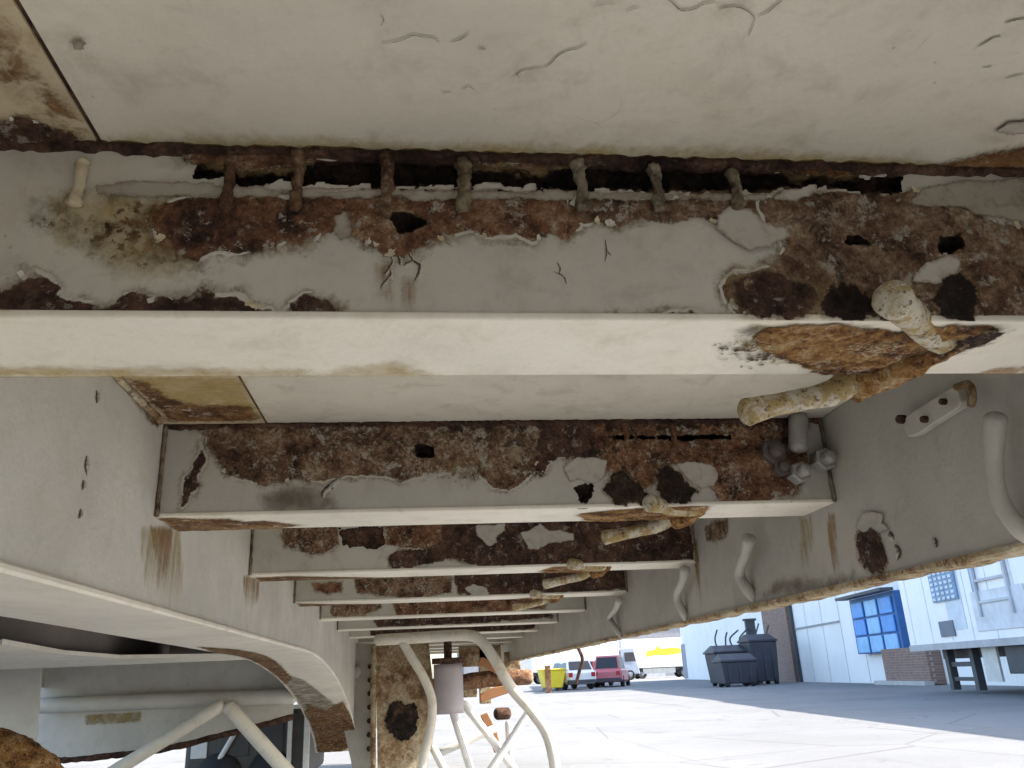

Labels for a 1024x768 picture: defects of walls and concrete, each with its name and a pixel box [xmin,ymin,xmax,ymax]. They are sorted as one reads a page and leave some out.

crack [380,16,484,50]
crack [668,0,783,36]
peeling [96,179,818,251]
crack [381,252,424,290]
corrosion [0,154,1024,375]
peeling [912,255,960,284]
peeling [563,457,608,484]
peeling [674,461,719,490]
corrosion [95,371,809,636]
peeling [475,523,506,546]
peeling [520,524,575,550]
corrosion [198,647,355,753]